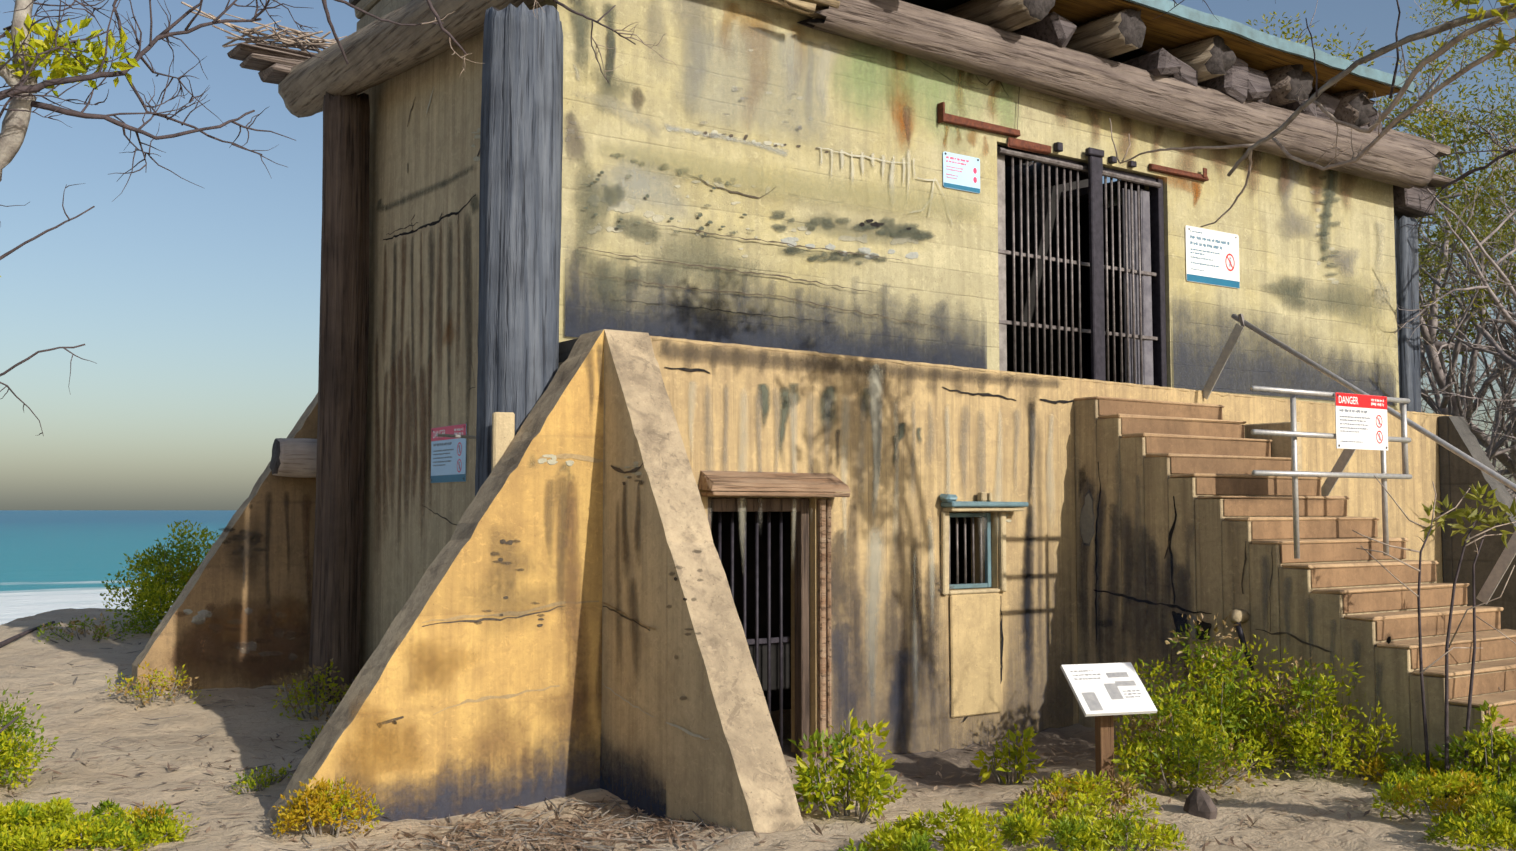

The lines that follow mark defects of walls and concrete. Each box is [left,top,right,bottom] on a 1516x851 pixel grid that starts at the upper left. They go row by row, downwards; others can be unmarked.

water stain [572,2,615,91]
spalling [565,115,584,155]
peeling [666,93,828,154]
rust [891,51,911,141]
crack [383,194,476,240]
peeling [583,153,775,258]
peeling [773,211,932,264]
water stain [564,271,1058,500]
water stain [622,485,639,560]
water stain [1023,404,1035,679]
crack [1094,462,1212,642]
crack [422,601,656,631]